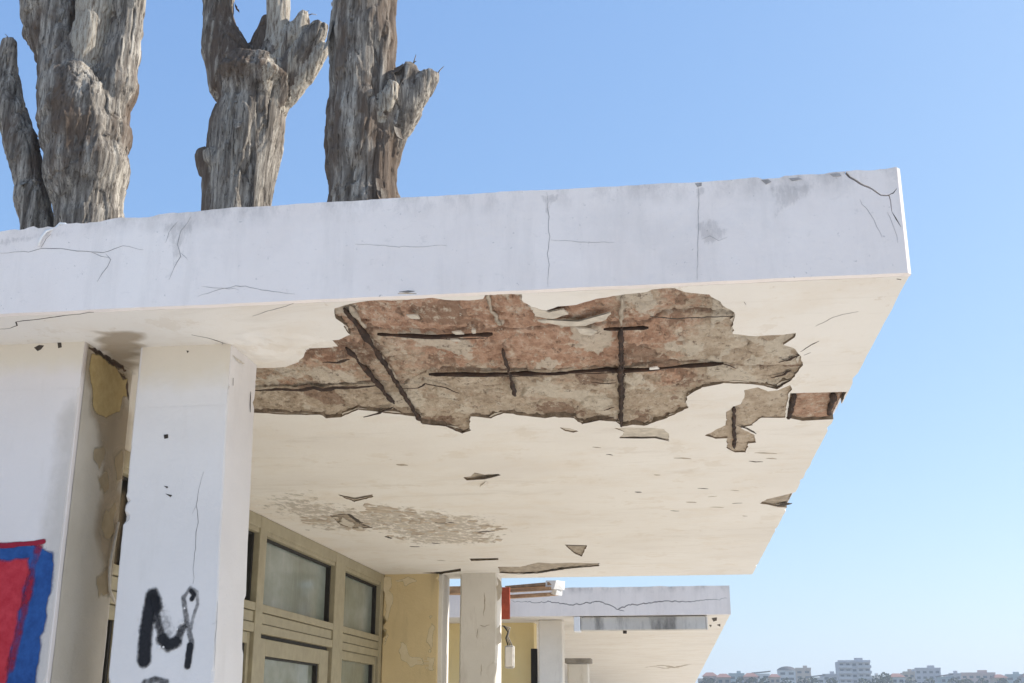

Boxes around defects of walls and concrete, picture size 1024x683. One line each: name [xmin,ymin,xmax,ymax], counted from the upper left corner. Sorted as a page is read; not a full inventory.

crack [10,217,191,280]
crack [547,197,614,274]
crack [860,190,900,241]
crack [202,285,294,316]
peeling [89,353,128,418]
damp [102,333,139,380]
spalling [234,288,842,462]
damp [99,398,129,569]
peeling [97,568,108,596]
flaking render [471,545,598,601]
crack [513,598,724,611]
peeling [488,662,496,680]